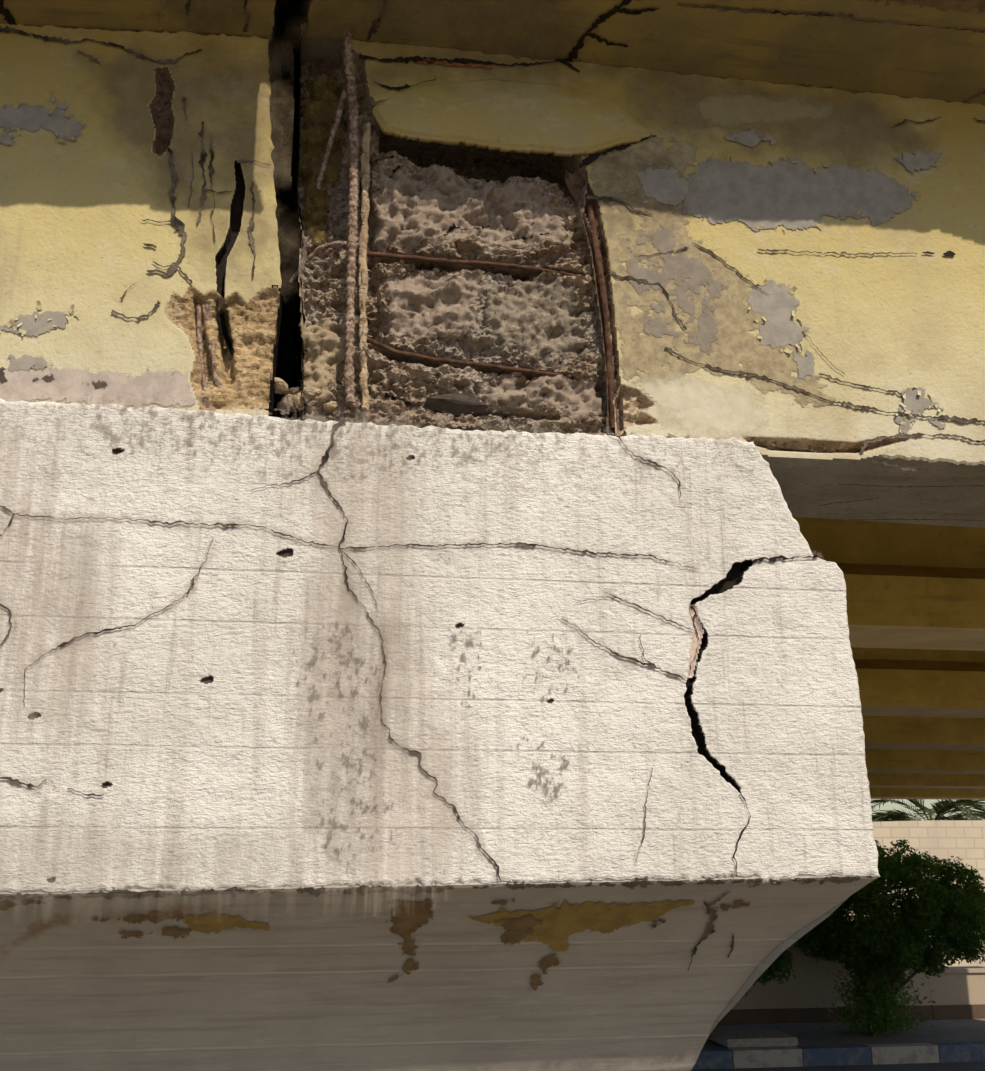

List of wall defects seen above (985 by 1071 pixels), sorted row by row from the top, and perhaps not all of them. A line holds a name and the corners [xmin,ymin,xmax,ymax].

crack [0,0,202,64]
crack [359,0,985,91]
peeling [0,91,86,145]
spalling [142,62,182,162]
crack [111,97,271,356]
spalling [289,30,946,460]
spalling [0,279,280,415]
crack [609,242,985,521]
crack [0,418,818,970]
peeling [92,911,269,939]
peeling [386,898,434,983]
peeling [469,898,694,991]